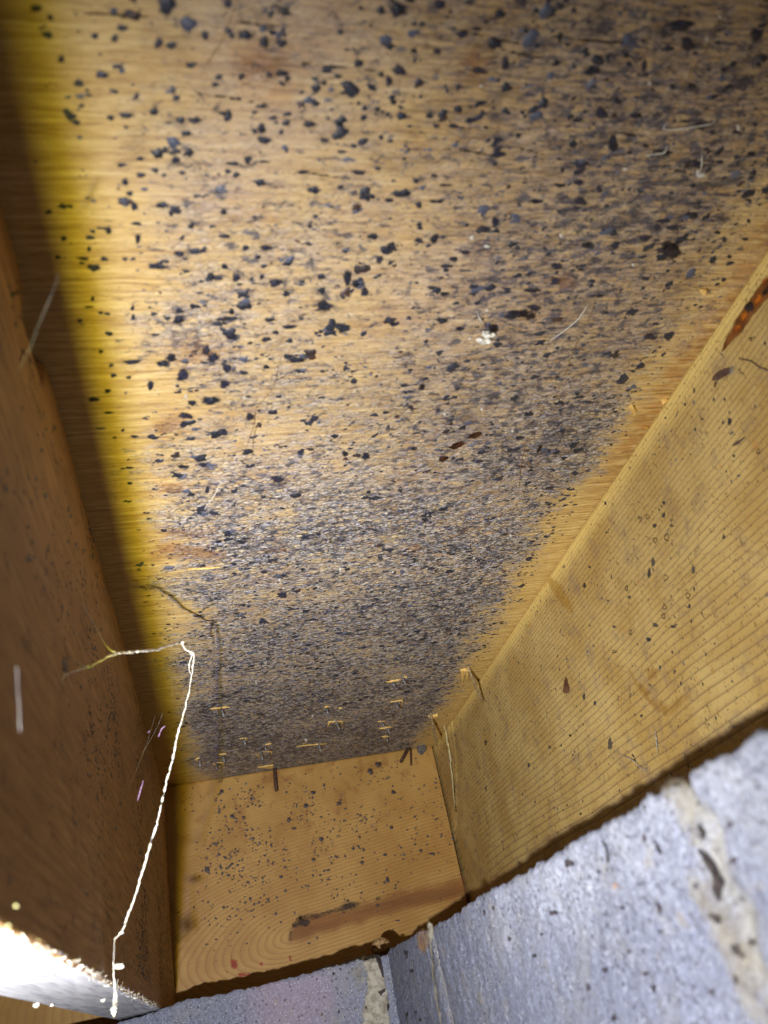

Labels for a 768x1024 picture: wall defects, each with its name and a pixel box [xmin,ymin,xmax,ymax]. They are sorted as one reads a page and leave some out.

mould [110,0,142,43]
mould [159,0,209,40]
mould [224,0,292,48]
mould [377,0,426,38]
mould [456,9,506,38]
mould [510,0,590,48]
mould [607,5,699,91]
mould [62,79,93,139]
mould [96,23,768,951]